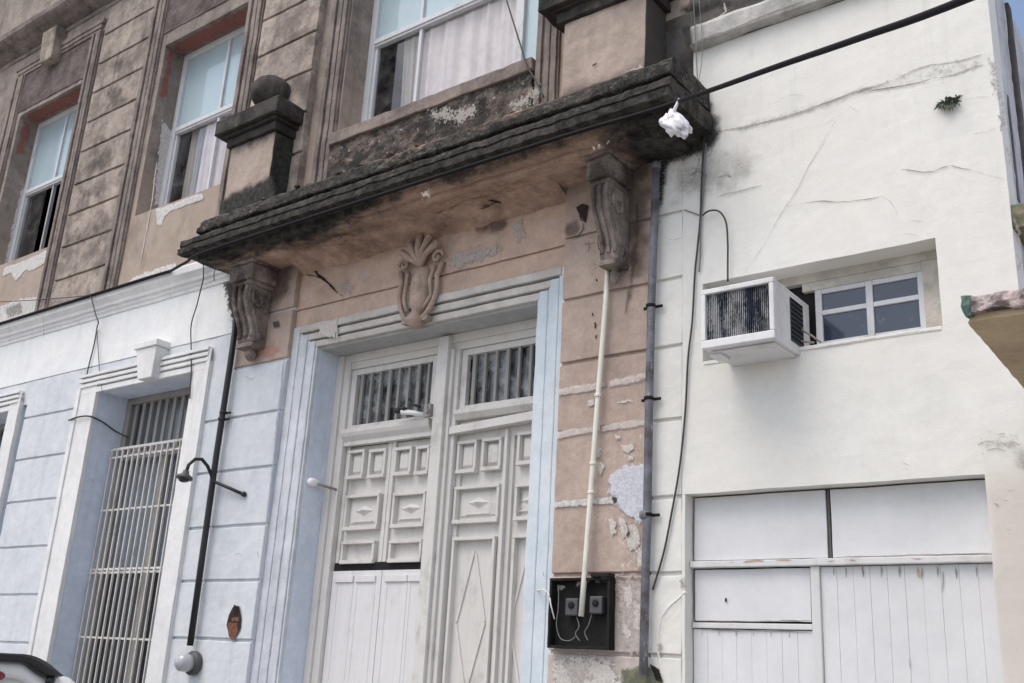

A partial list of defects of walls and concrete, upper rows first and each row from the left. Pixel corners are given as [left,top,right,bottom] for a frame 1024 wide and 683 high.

damp [659,159,668,205]
crack [719,53,986,272]
crack [308,271,342,296]
peeling [609,373,646,387]
peeling [547,420,662,683]